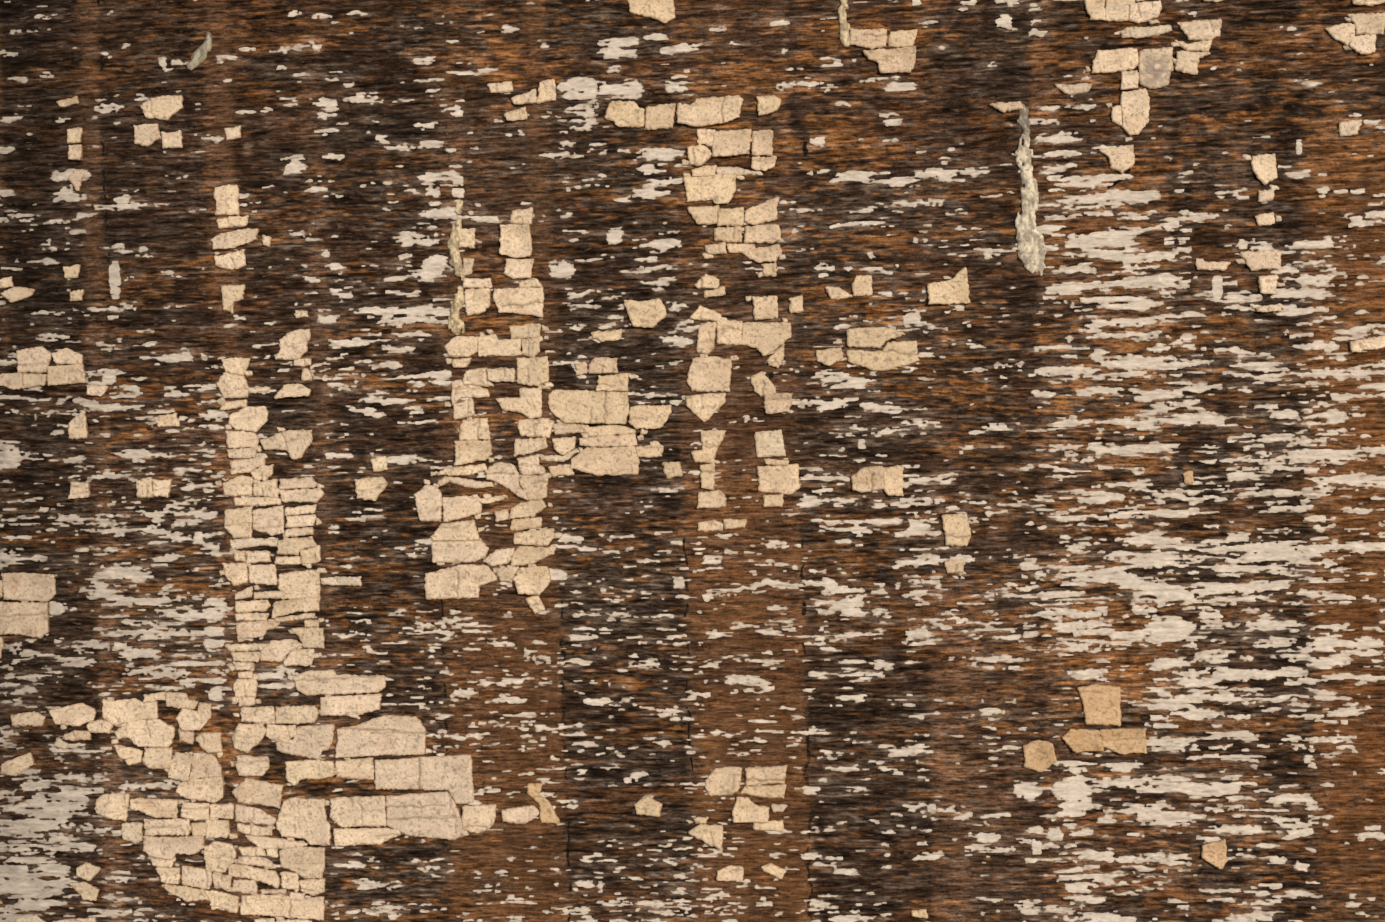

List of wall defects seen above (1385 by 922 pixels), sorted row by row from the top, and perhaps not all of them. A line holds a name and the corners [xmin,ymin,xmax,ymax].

peeling [957,0,977,12]
peeling [994,0,1048,37]
peeling [1173,163,1200,193]
peeling [1316,186,1365,198]
peeling [188,154,344,270]
peeling [208,284,257,328]
peeling [293,264,340,324]
peeling [651,487,684,497]
peeling [411,850,460,877]
peeling [352,878,406,891]